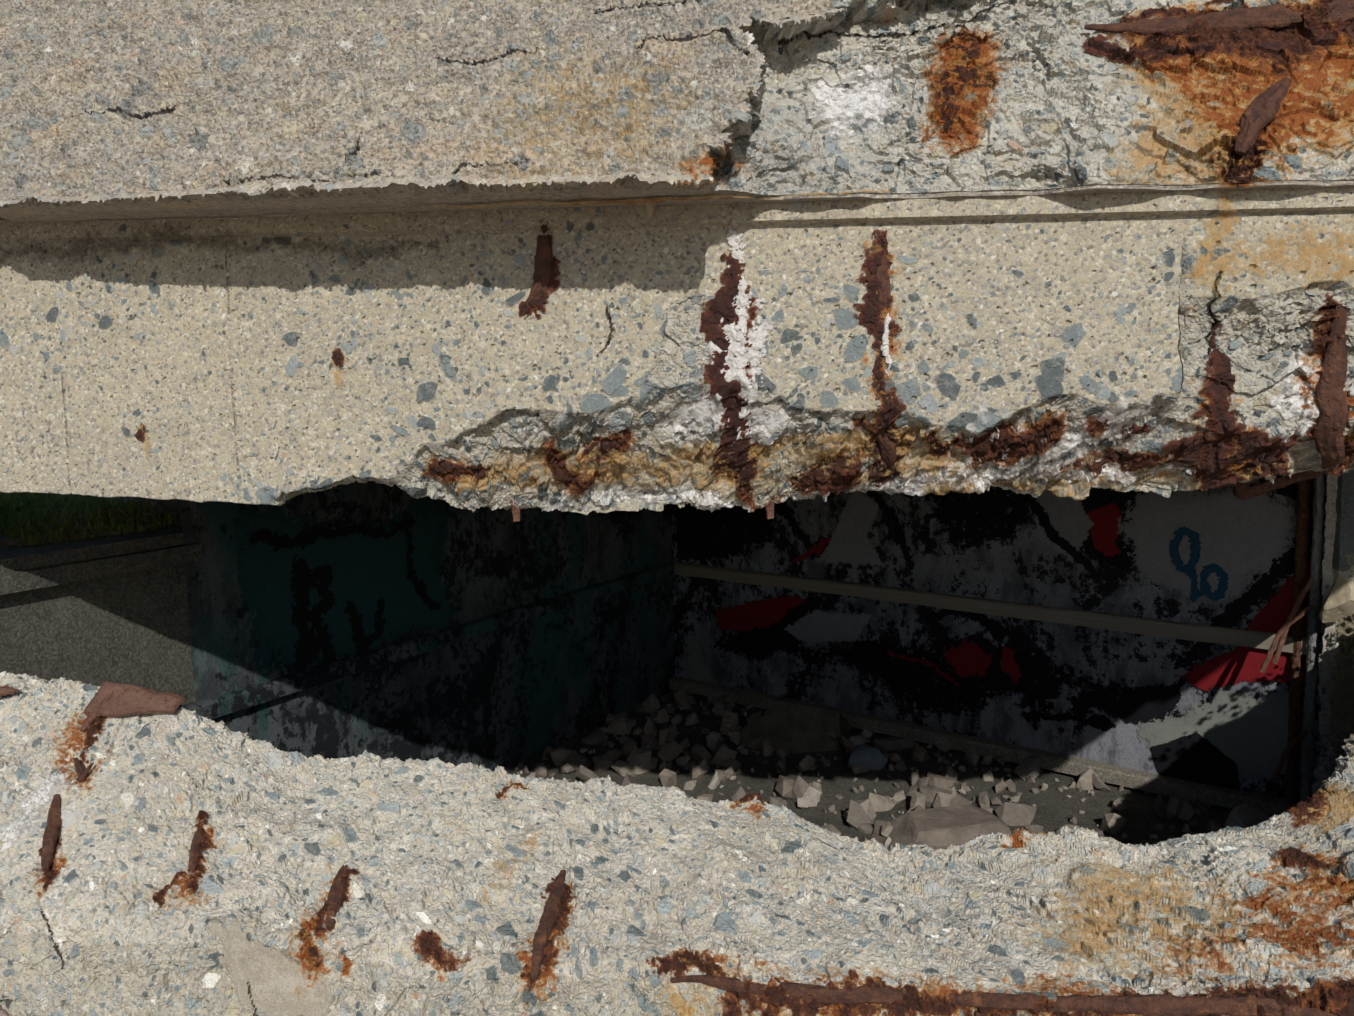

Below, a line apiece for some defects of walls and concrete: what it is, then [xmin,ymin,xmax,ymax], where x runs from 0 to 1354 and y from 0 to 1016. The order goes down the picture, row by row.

crack [594,0,1017,56]
crack [85,105,176,120]
corrosion [921,24,1001,156]
spalling [705,0,1354,195]
spalling [518,220,561,318]
spalling [269,244,1354,516]
corrosion [700,229,1304,512]
corrosion [423,455,490,493]
corrosion [540,429,640,496]
corrosion [73,716,109,766]
corrosion [1041,784,1354,993]
corrosion [670,984,755,1016]